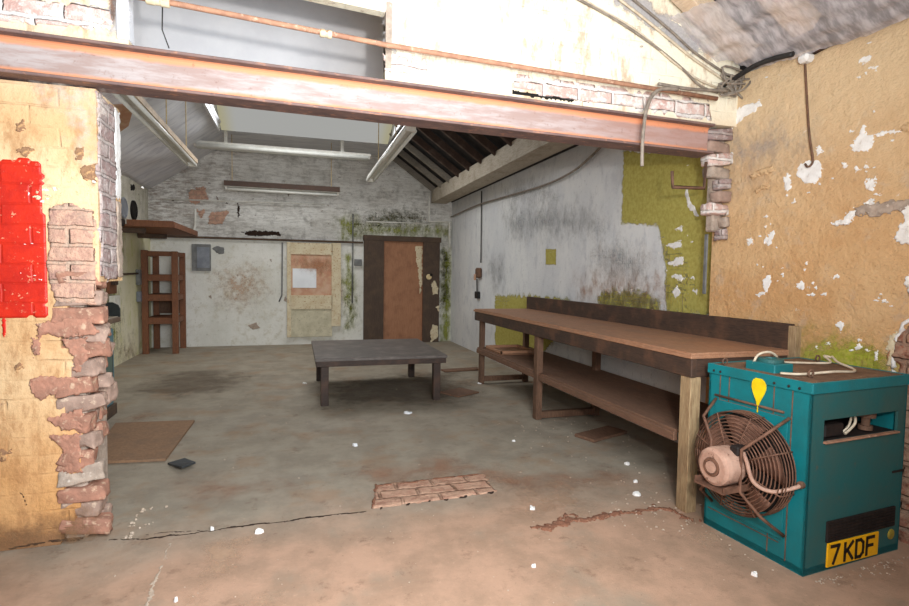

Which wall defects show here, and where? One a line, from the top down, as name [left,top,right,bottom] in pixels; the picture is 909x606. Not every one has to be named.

flaking render [0,0,113,30]
leakage [341,212,422,239]
flaking render [512,74,762,241]
peeling [783,145,834,204]
flaking render [831,162,909,245]
peeling [849,125,901,152]
peeling [415,246,438,295]
spalling [28,91,144,539]
flaking render [849,318,909,374]
flaking render [899,385,909,544]
crack [8,537,83,550]
crack [109,511,366,606]